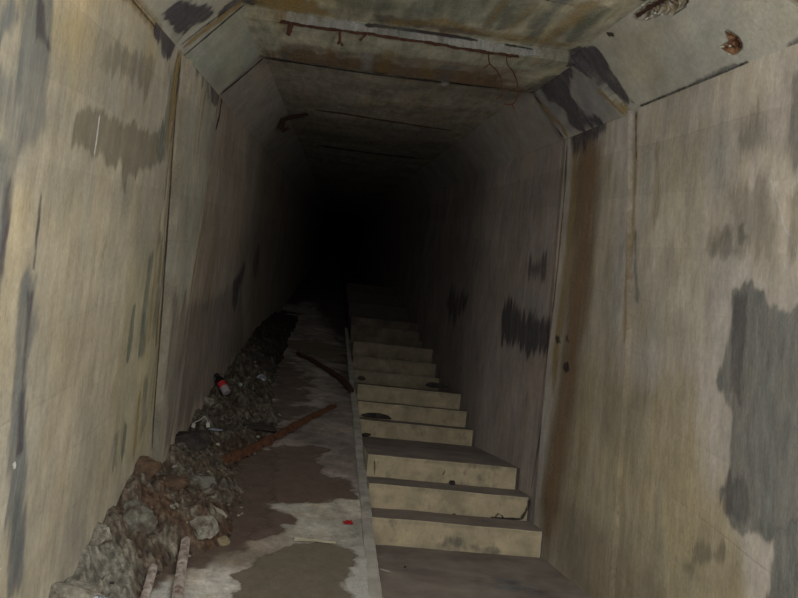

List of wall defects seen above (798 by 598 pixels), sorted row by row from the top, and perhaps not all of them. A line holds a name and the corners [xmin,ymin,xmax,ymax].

damp [0,0,52,96]
damp [73,82,174,190]
damp [154,0,260,61]
damp [533,13,629,154]
spalling [633,0,687,20]
spalling [720,31,741,55]
damp [0,155,9,272]
damp [5,259,35,595]
damp [717,281,798,598]
damp [150,445,369,598]